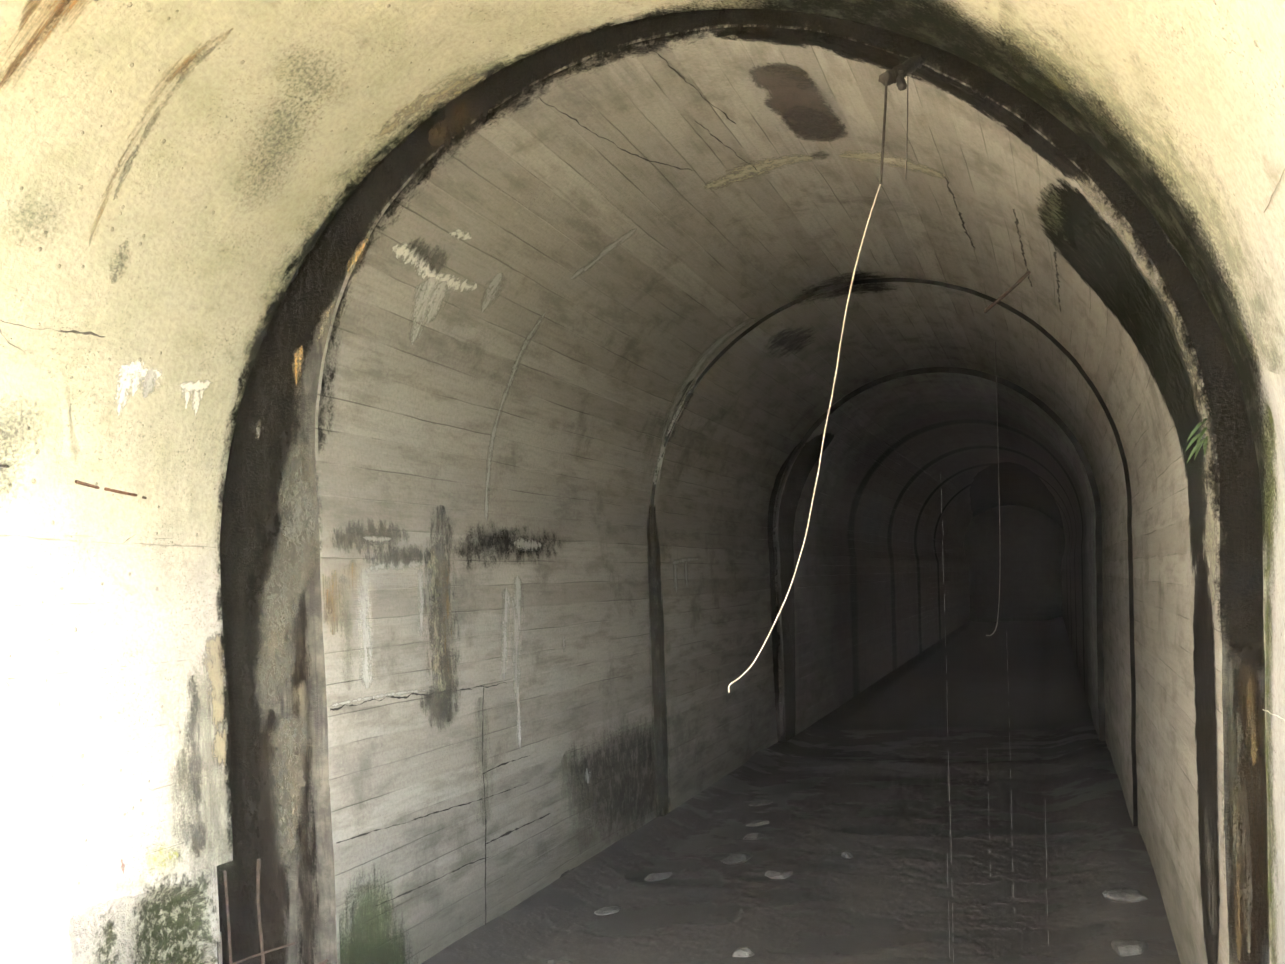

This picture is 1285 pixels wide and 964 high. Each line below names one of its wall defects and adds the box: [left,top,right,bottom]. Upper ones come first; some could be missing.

rust [0,0,85,86]
rust [91,28,233,238]
crack [0,320,104,353]
damp [392,239,502,345]
damp [797,271,896,304]
damp [187,676,205,857]
damp [290,594,319,964]
damp [333,312,560,749]
damp [571,504,698,840]
damp [767,432,834,742]
damp [1038,176,1220,964]
rust [1223,658,1269,964]